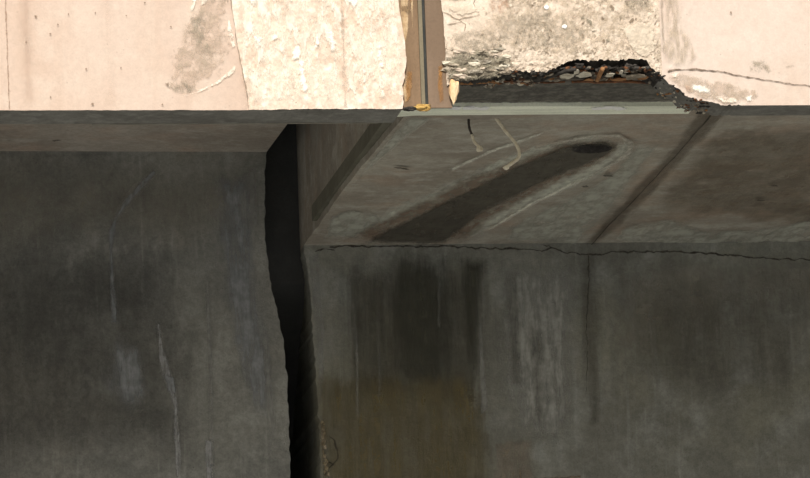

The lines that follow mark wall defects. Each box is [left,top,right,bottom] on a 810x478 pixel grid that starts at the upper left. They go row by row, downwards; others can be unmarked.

crack [442,0,480,31]
spalling [440,7,756,114]
crack [668,68,810,87]
water stain [329,135,650,244]
crack [315,245,810,261]
water stain [320,263,487,478]
water stain [505,271,571,433]